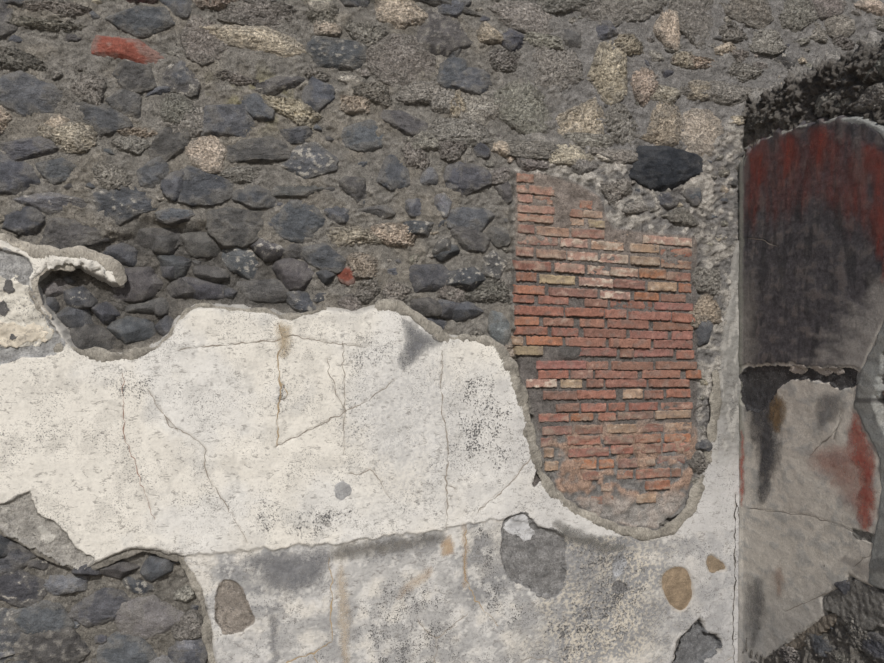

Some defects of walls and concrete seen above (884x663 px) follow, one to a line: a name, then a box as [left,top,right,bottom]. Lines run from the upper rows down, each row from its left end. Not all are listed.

spalling [0,247,65,365]
spalling [47,257,107,277]
spalling [0,491,96,570]
crack [122,373,155,518]
crack [147,389,247,542]
spalling [214,580,254,635]
crack [180,325,395,454]
crack [418,351,498,663]
spalling [672,622,723,663]
leakage [747,385,777,502]
crack [724,494,854,663]
spalling [739,364,858,411]